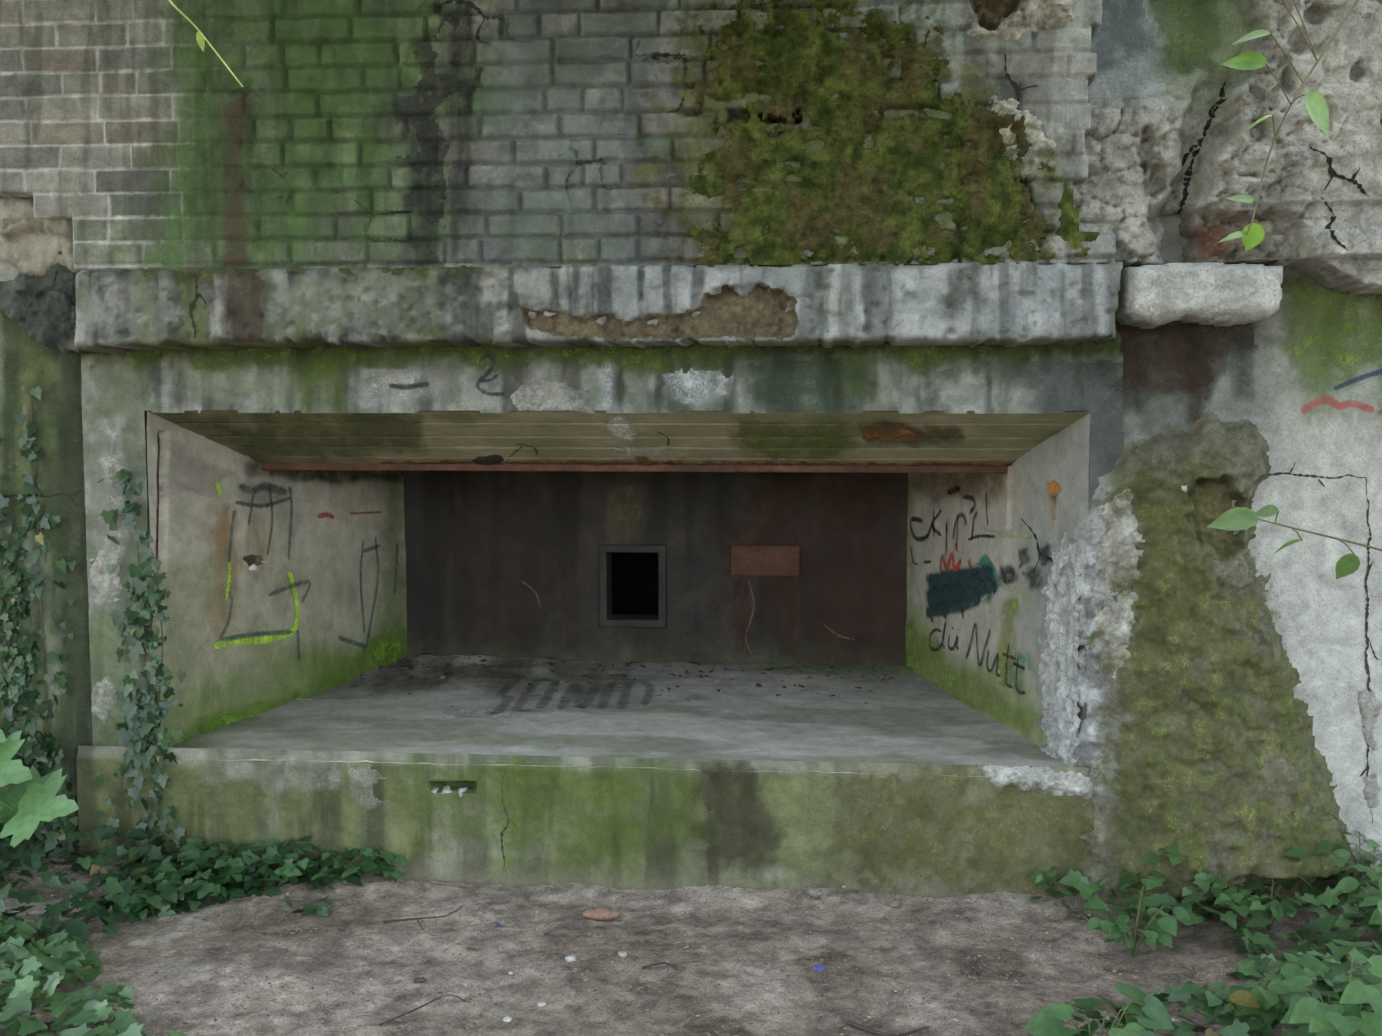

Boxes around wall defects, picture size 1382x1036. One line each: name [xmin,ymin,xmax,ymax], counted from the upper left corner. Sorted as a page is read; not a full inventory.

spalling [967,0,1078,41]
spalling [990,95,1056,182]
crack [1174,81,1227,215]
spalling [1073,0,1382,294]
spalling [518,284,799,341]
crack [3,470,132,503]
rust [382,458,985,466]
rust [858,422,962,446]
crack [1268,463,1382,692]
spalling [982,489,1145,799]
crack [500,770,519,870]
crack [1359,743,1373,823]